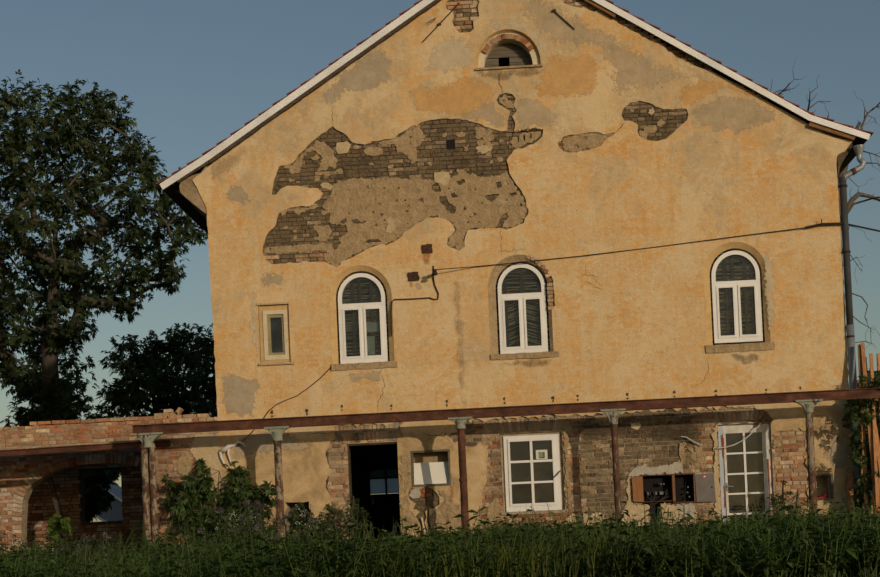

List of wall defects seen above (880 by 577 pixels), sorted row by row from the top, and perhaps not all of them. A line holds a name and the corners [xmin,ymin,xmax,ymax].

peeling [323,49,392,104]
flaking render [445,0,479,33]
peeling [523,0,768,153]
flaking render [262,93,555,286]
flaking render [325,422,404,542]
flaking render [398,406,810,541]